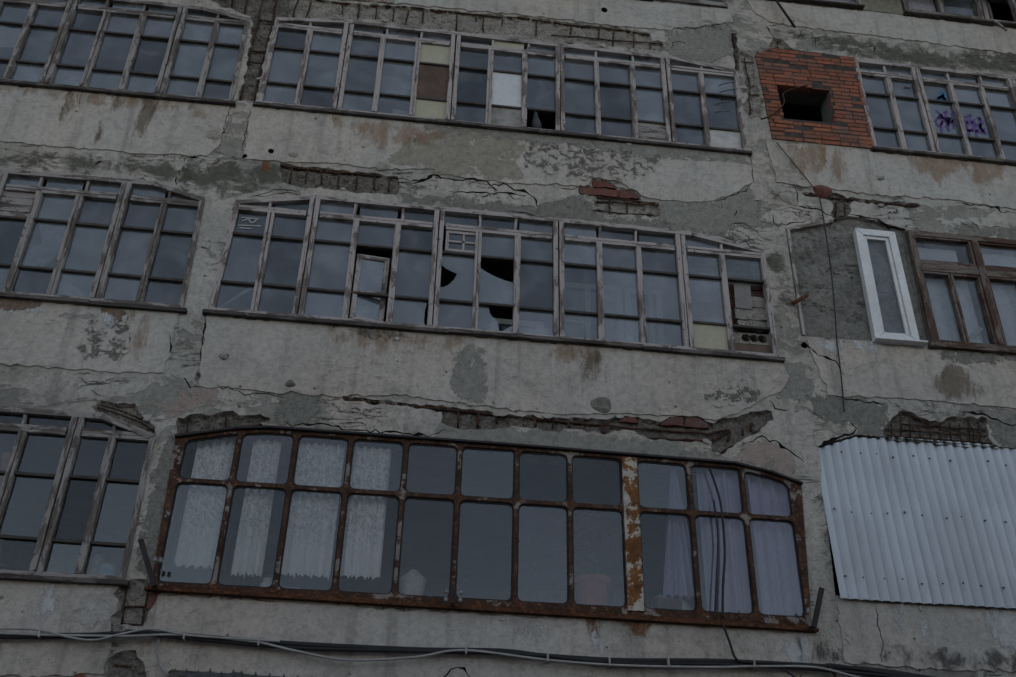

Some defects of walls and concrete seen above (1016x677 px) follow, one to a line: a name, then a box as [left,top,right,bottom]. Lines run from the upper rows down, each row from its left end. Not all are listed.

spalling [211,0,664,101]
crack [397,174,540,216]
peeling [279,122,772,241]
crack [956,202,1013,228]
peeling [76,307,132,362]
spalling [91,401,156,435]
spalling [342,344,797,477]
spalling [776,362,1016,449]
peeling [112,391,321,627]
spalling [107,650,146,677]